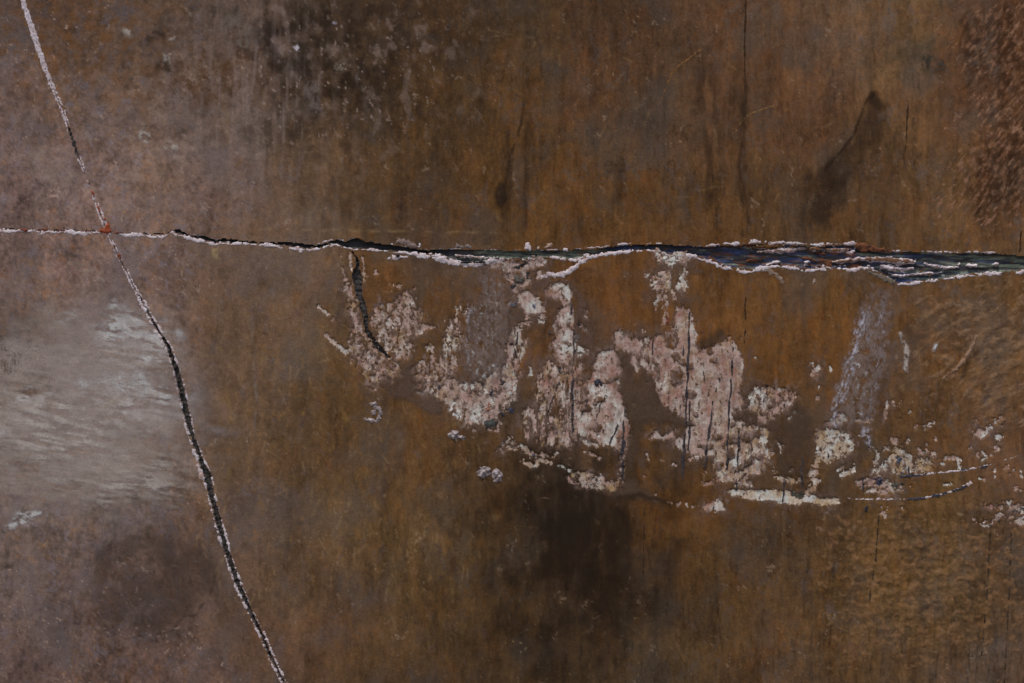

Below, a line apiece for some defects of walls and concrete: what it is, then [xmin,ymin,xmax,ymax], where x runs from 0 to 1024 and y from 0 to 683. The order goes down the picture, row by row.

crack [21,0,85,173]
crack [735,0,774,132]
crack [903,100,911,152]
crack [0,183,1024,683]
peeling [324,247,1024,528]